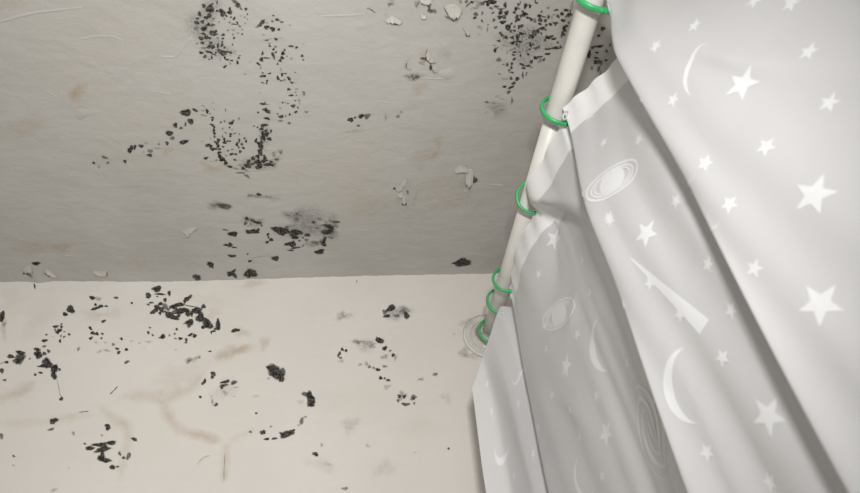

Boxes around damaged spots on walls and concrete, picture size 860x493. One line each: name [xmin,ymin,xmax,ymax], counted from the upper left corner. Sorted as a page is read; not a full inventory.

water stain [194,0,248,68]
peeling [404,51,438,73]
water stain [465,0,572,103]
water stain [165,15,304,177]
water stain [223,217,339,257]
water stain [227,254,258,278]
water stain [146,286,220,343]
water stain [383,304,410,319]
water stain [0,305,75,381]
water stain [266,364,285,382]
water stain [249,390,315,440]
water stain [84,424,131,469]